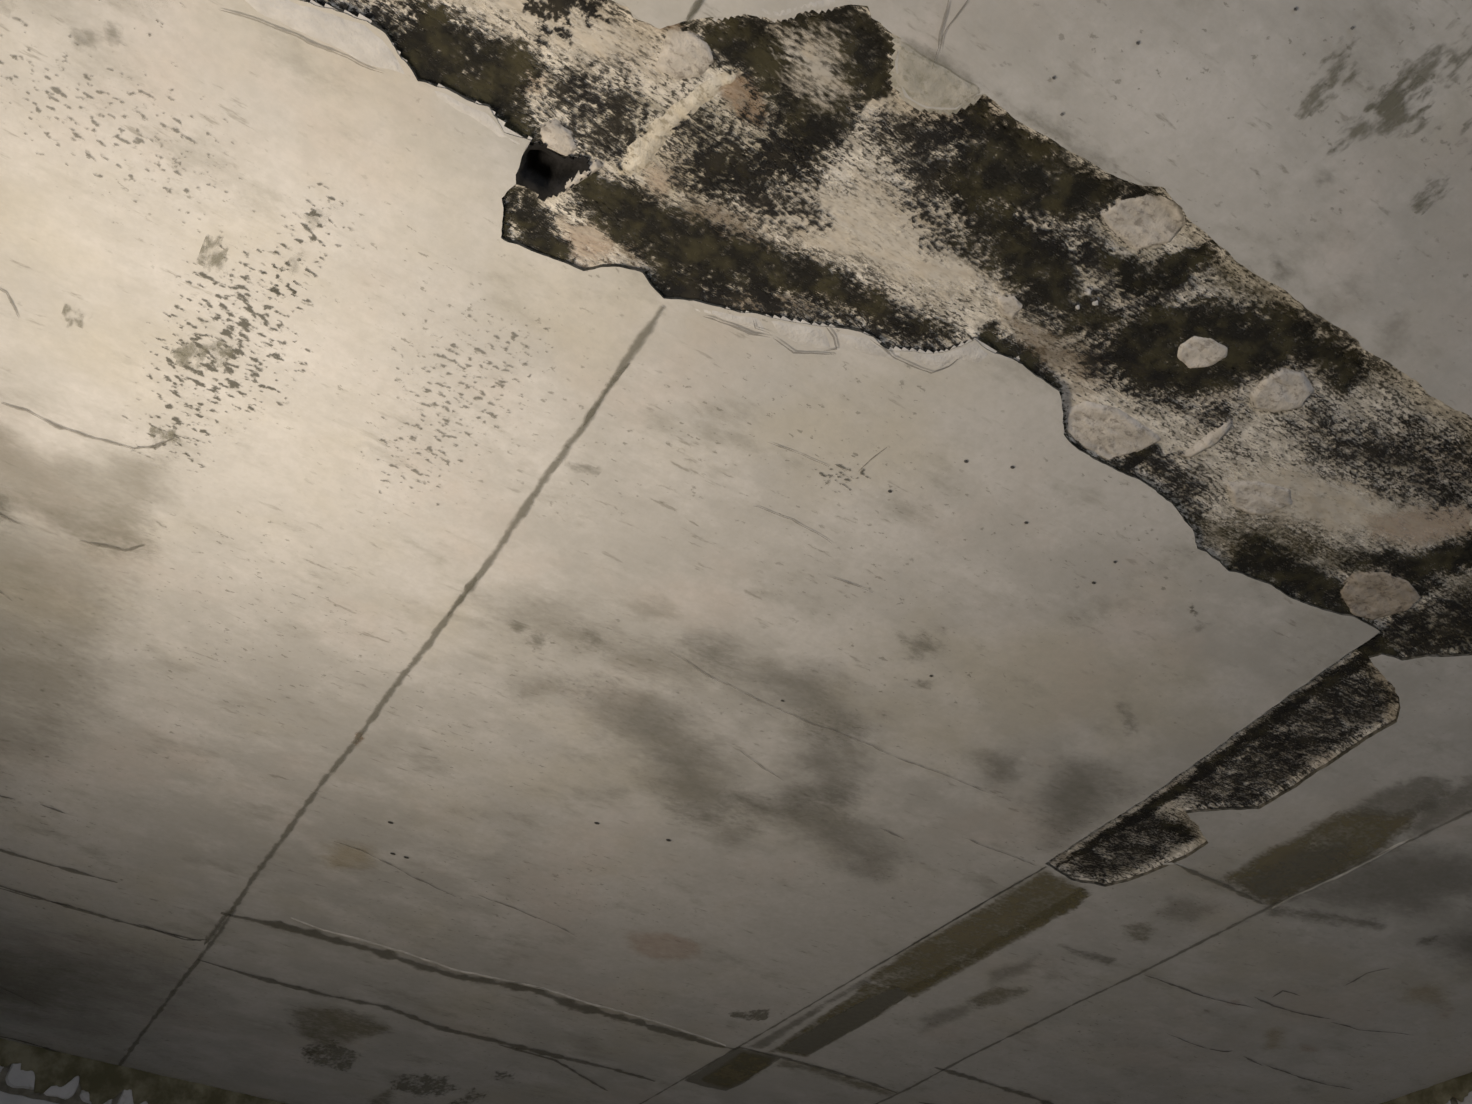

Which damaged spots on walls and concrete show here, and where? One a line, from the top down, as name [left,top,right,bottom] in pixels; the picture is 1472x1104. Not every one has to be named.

damp [1351,47,1472,137]
damp [147,183,344,468]
spalling [245,0,1472,887]
damp [1227,810,1414,904]
damp [685,873,1088,1091]